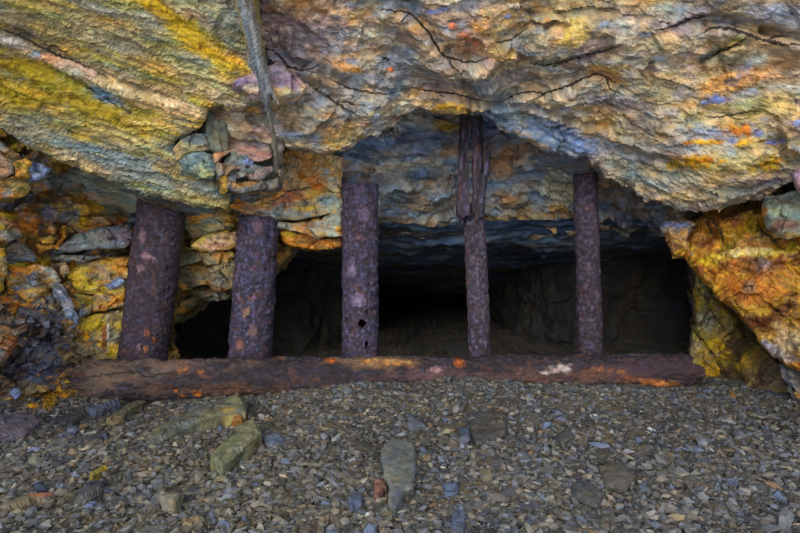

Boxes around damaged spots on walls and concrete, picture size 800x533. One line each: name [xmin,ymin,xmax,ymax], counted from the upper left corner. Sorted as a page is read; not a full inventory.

rust [137,228,156,272]
rust [351,293,366,307]
rust [591,365,667,387]